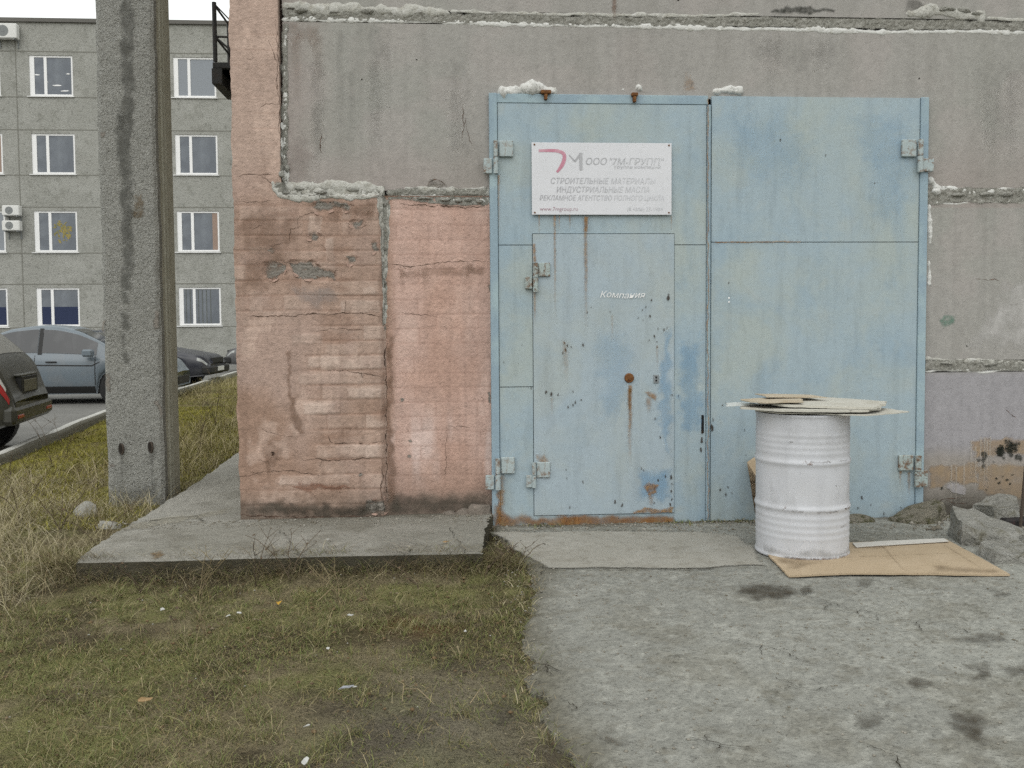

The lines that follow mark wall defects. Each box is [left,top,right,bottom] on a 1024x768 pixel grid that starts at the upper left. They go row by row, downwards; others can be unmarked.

water stain [118,42,133,238]
spalling [313,200,362,228]
spalling [263,245,334,282]
crack [237,302,388,558]
rust [496,492,673,526]